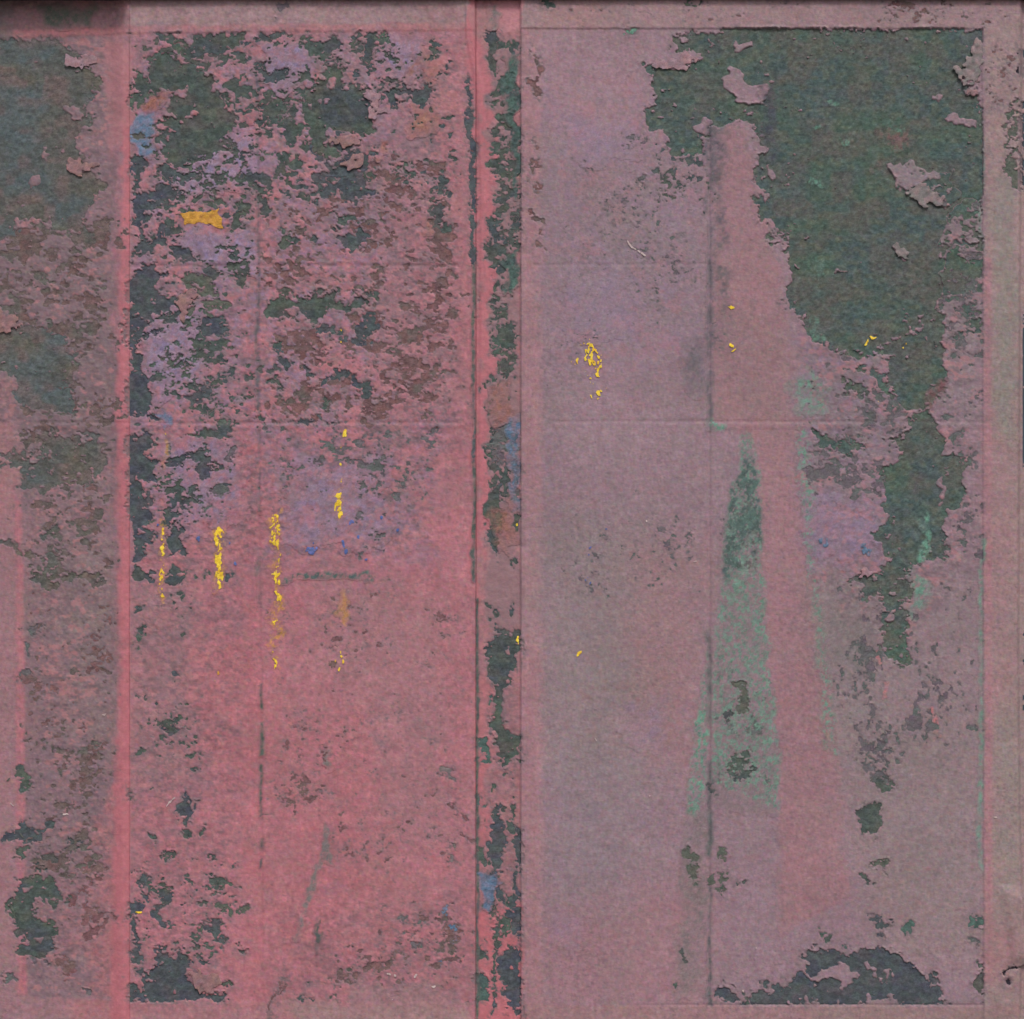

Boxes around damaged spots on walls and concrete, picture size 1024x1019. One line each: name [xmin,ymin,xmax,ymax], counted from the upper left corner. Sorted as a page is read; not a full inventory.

peeling [0,31,547,1016]
peeling [596,0,1019,840]
peeling [714,914,951,1005]